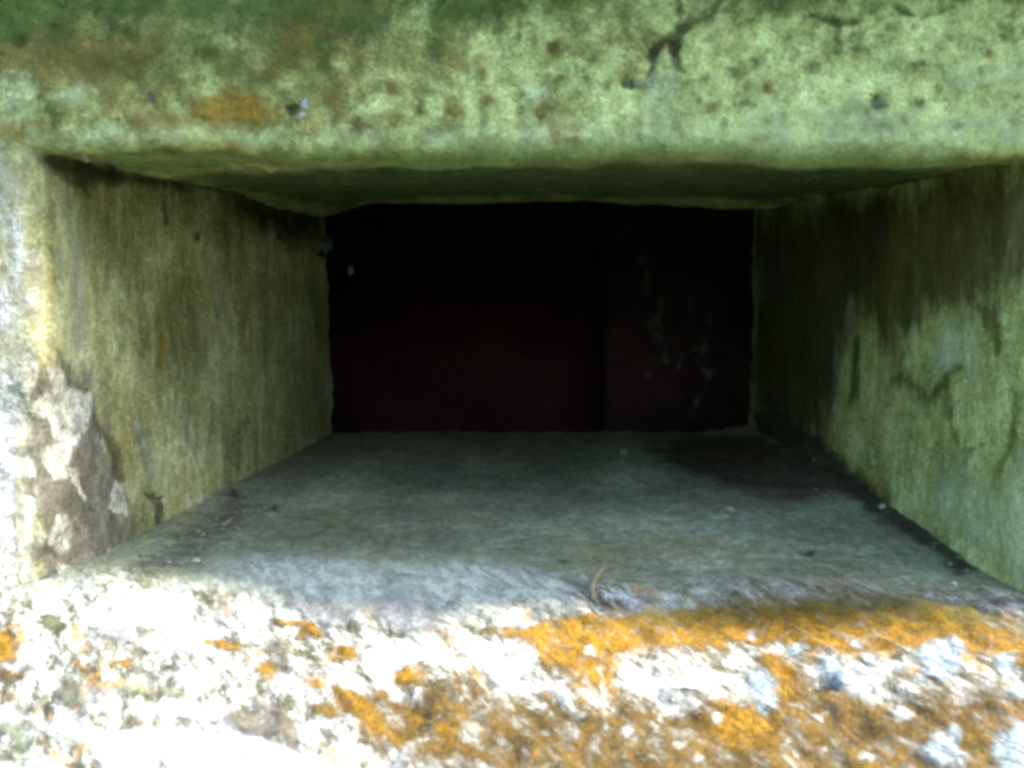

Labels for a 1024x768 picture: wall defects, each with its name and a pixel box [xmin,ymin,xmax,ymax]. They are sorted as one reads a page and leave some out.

crack [646,0,720,89]
water stain [754,169,1024,501]
water stain [940,474,1024,569]